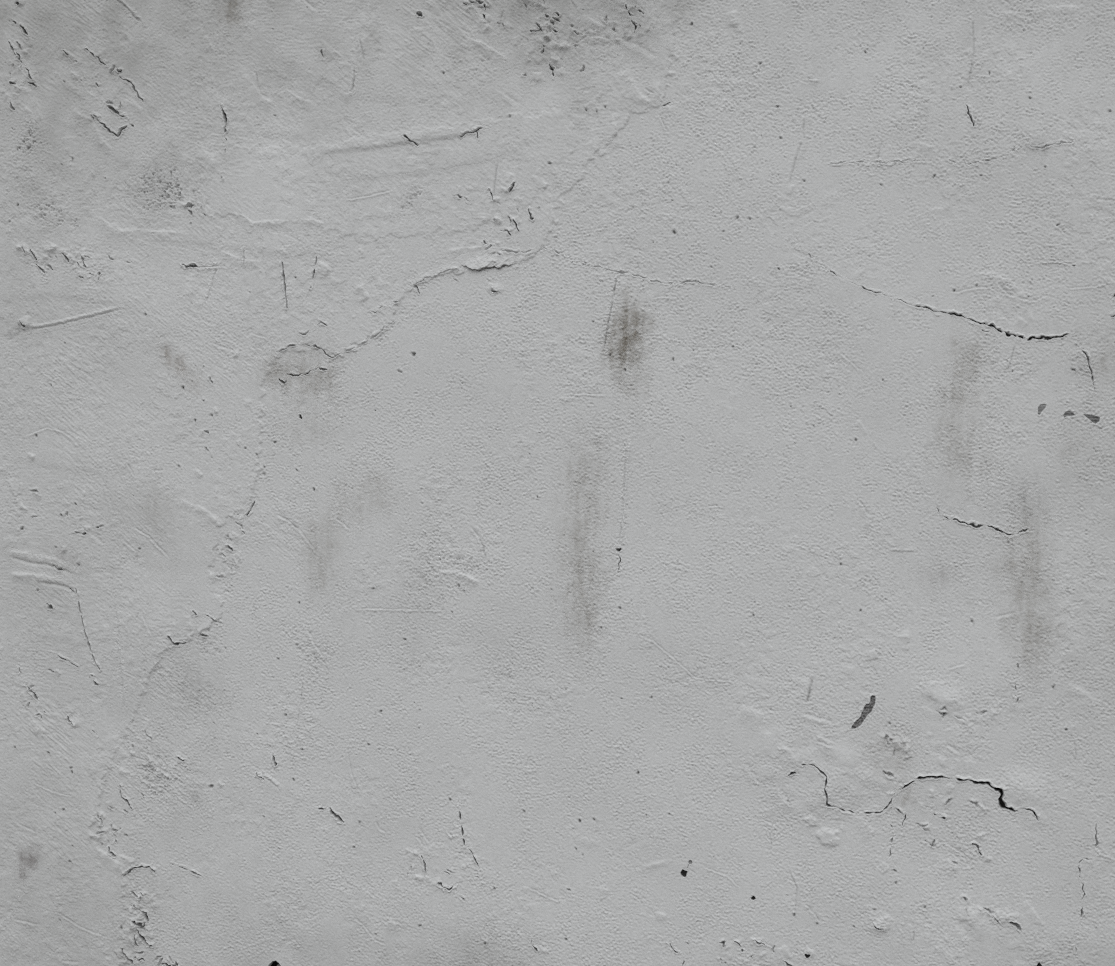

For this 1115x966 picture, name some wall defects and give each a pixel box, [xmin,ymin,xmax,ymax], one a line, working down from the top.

crack [790,240,1099,395]
crack [931,505,1036,540]
crack [786,761,1042,863]